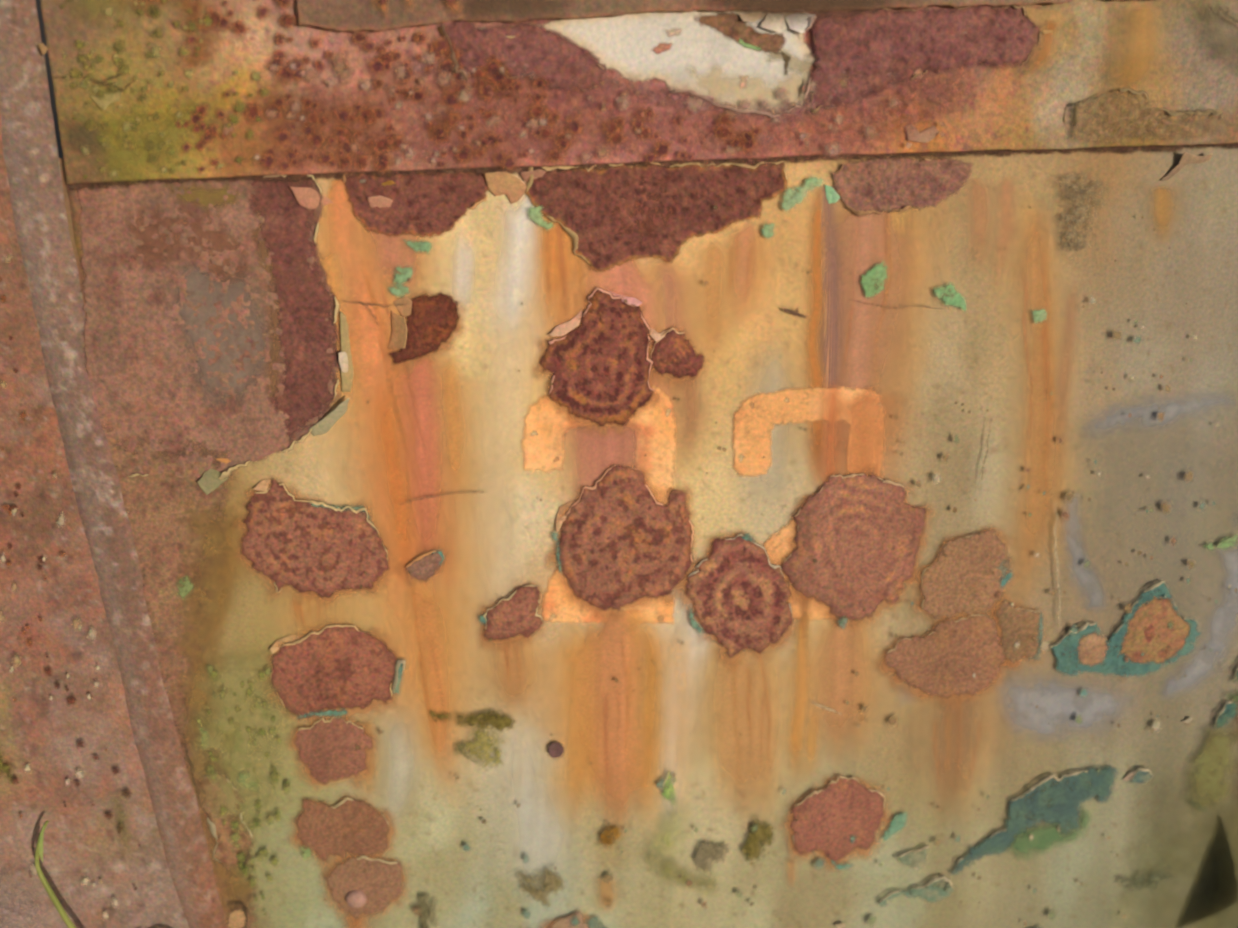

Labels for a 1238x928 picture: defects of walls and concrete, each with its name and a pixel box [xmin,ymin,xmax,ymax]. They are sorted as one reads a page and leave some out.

rust [442,0,606,94]
peeling [544,10,817,118]
rust [810,5,1042,113]
rust [1073,88,1223,143]
peeling [368,180,395,208]
peeling [484,169,553,230]
rust [525,155,1049,803]
rust [77,172,488,928]
peeling [1034,581,1202,677]
rust [786,776,890,868]
peeling [879,766,1117,906]